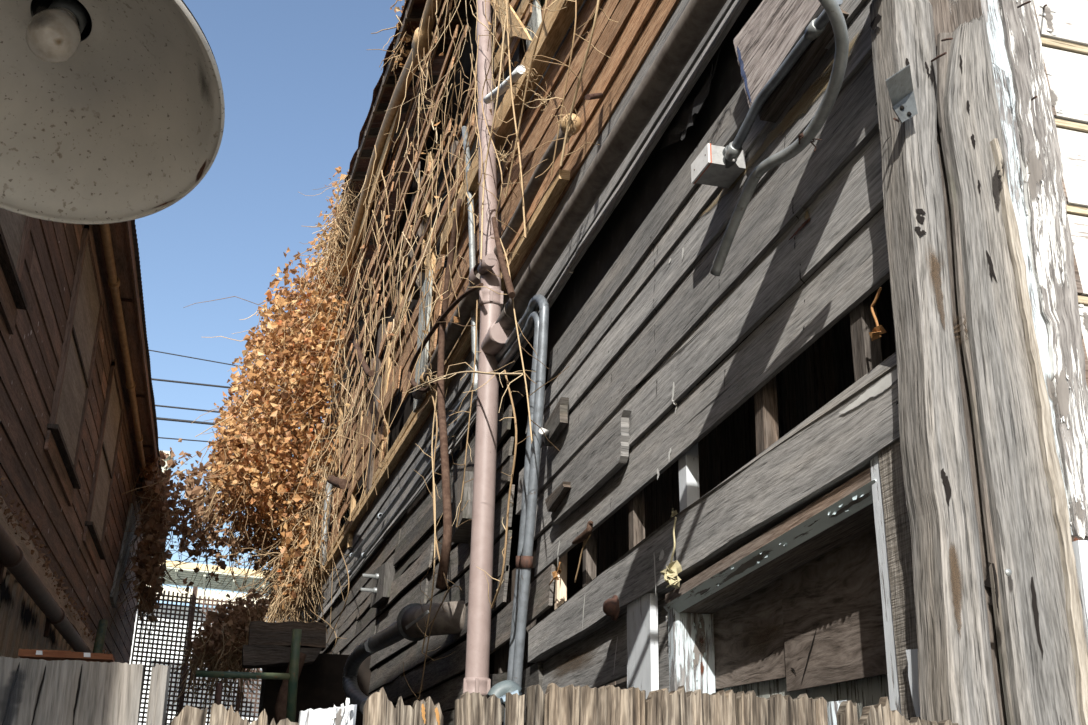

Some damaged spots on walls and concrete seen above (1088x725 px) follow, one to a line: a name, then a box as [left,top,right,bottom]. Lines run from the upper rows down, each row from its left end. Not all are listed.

peeling [1039,4,1057,35]
peeling [1046,72,1063,113]
peeling [1017,149,1044,220]
peeling [828,492,870,517]
peeling [717,542,787,586]
peeling [691,617,707,680]